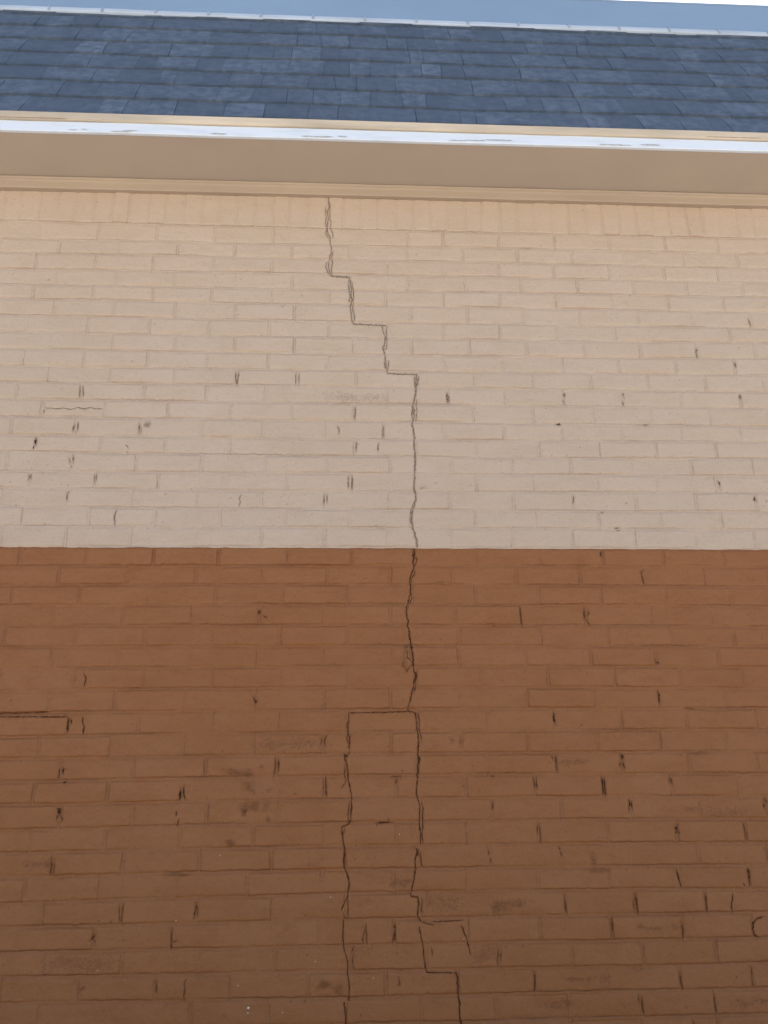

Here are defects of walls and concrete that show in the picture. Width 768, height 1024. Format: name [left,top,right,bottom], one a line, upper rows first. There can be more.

crack [0,712,84,733]
crack [325,198,471,1024]